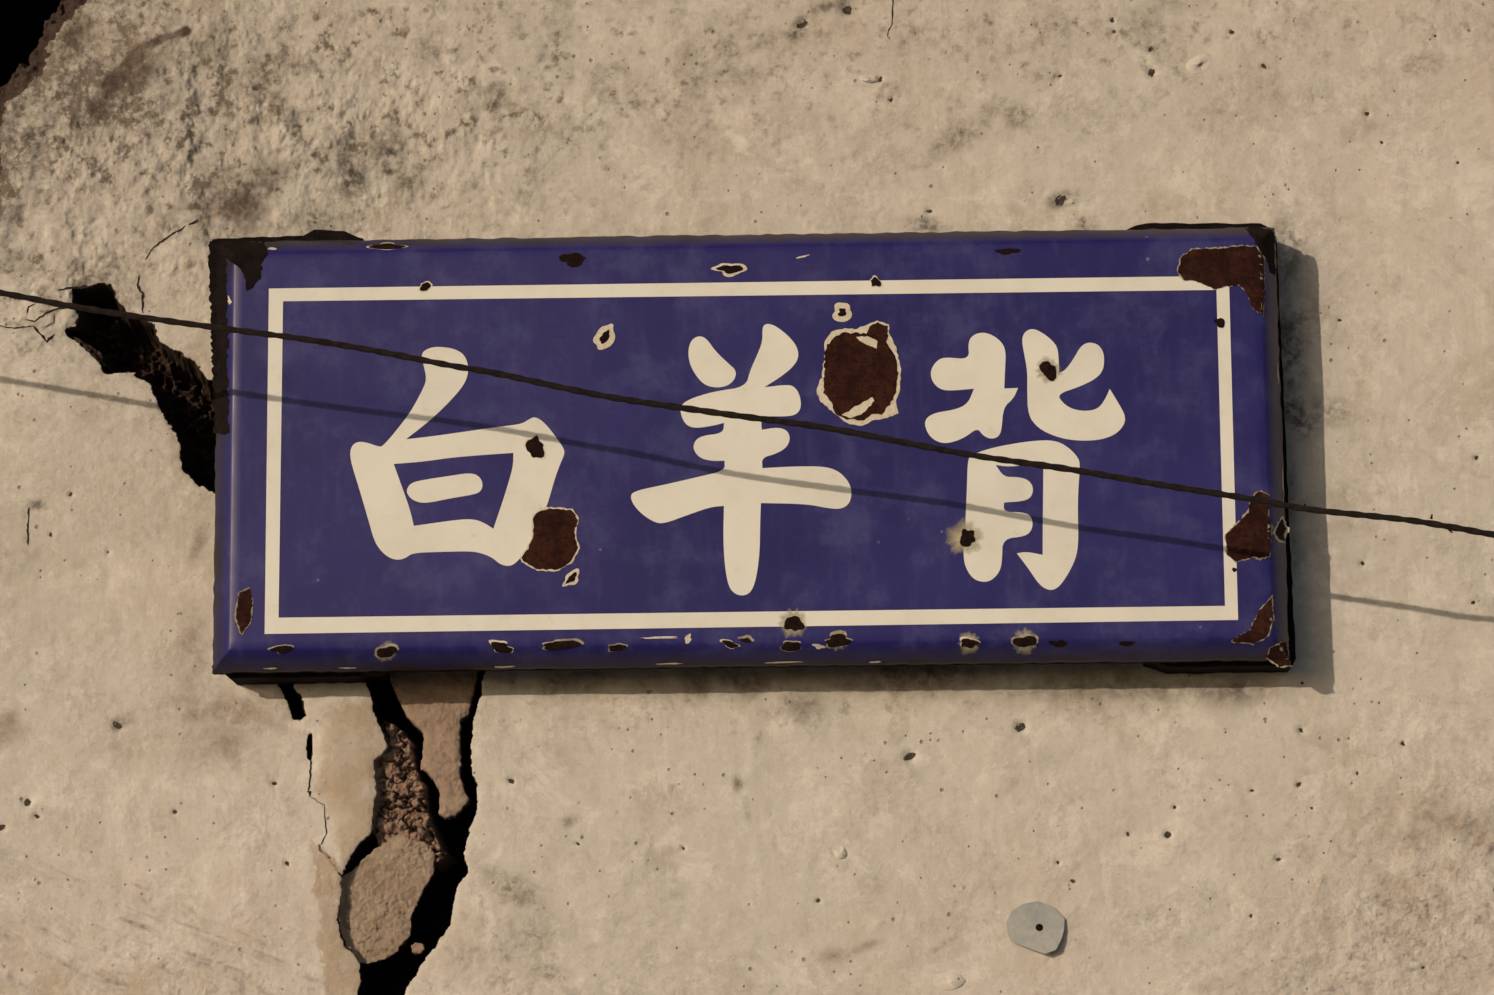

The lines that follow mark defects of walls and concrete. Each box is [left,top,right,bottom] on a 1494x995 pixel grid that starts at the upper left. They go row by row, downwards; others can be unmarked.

spalling [0,0,87,126]
crack [0,285,90,342]
crack [137,219,199,312]
crack [278,671,486,995]